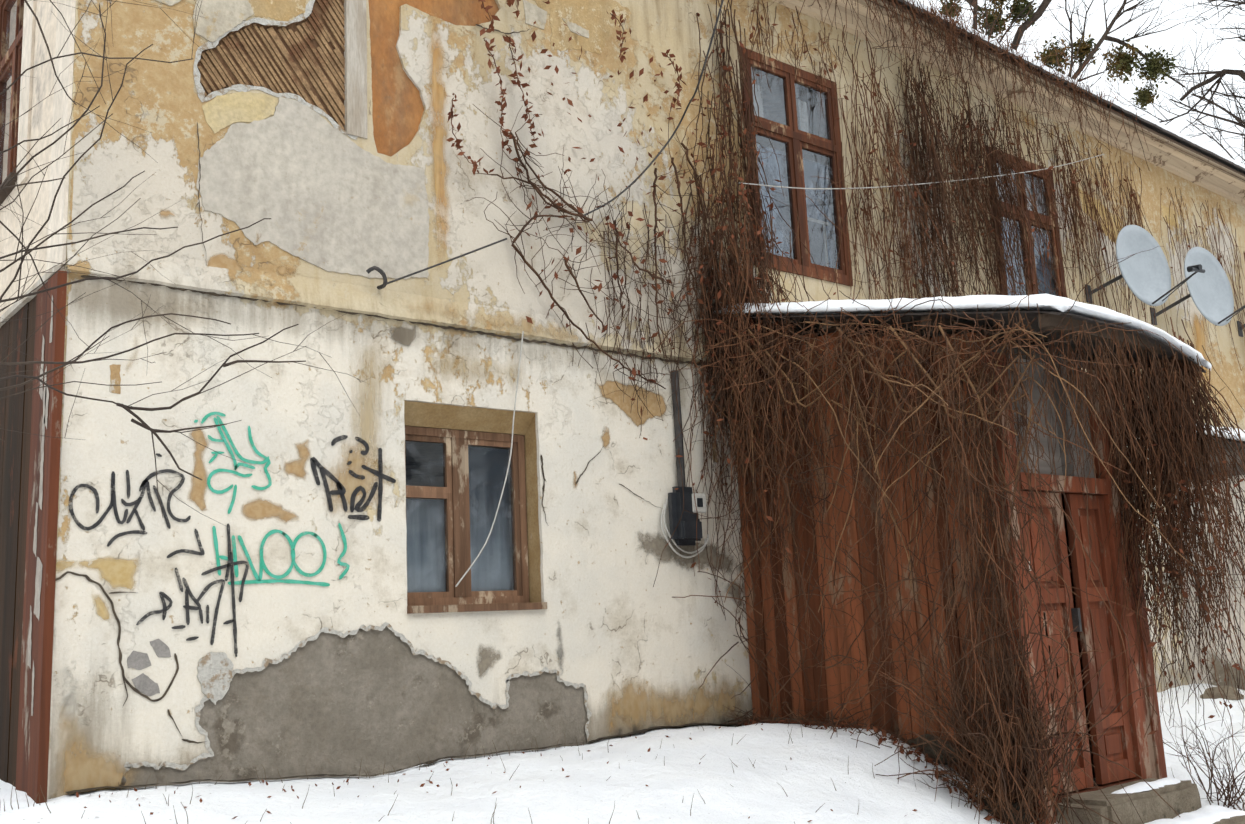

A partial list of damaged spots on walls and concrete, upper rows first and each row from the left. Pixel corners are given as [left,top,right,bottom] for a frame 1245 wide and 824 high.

flaking render [193,0,358,140]
flaking render [368,0,499,157]
peeling [208,254,242,271]
peeling [598,381,666,427]
peeling [285,442,310,478]
peeling [27,296,136,716]
peeling [243,500,297,522]
flaking render [115,622,592,790]
damp [610,683,744,732]